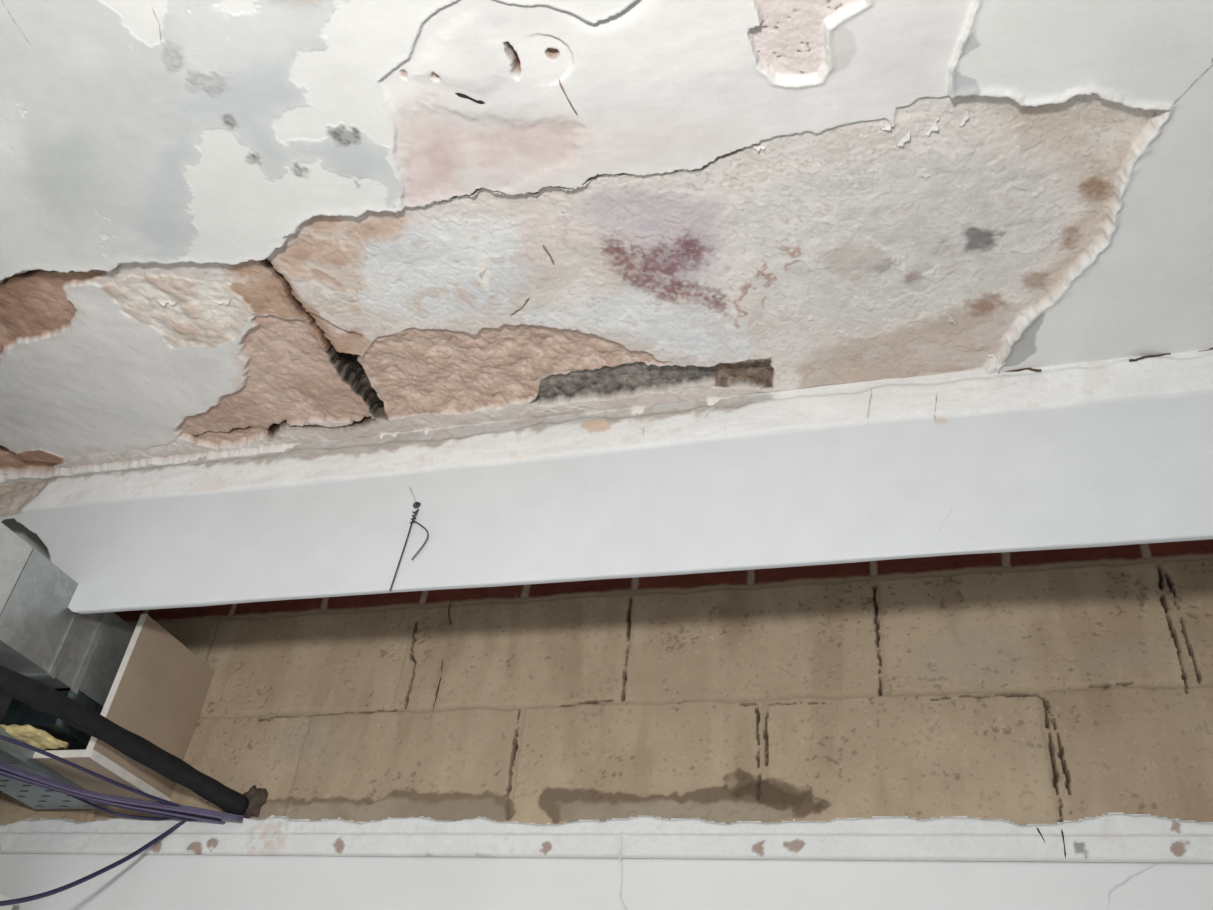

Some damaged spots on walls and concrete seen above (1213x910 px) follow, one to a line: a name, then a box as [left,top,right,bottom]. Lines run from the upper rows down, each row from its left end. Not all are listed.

leakage [0,0,405,272]
spalling [0,0,1169,482]
leakage [548,179,741,319]
crack [192,259,388,442]
crack [335,621,443,715]
crack [560,598,633,707]
crack [871,585,883,696]
crack [1156,567,1203,694]
crack [506,710,520,796]
leakage [537,766,834,824]
crack [740,701,825,780]
crack [931,693,1072,859]